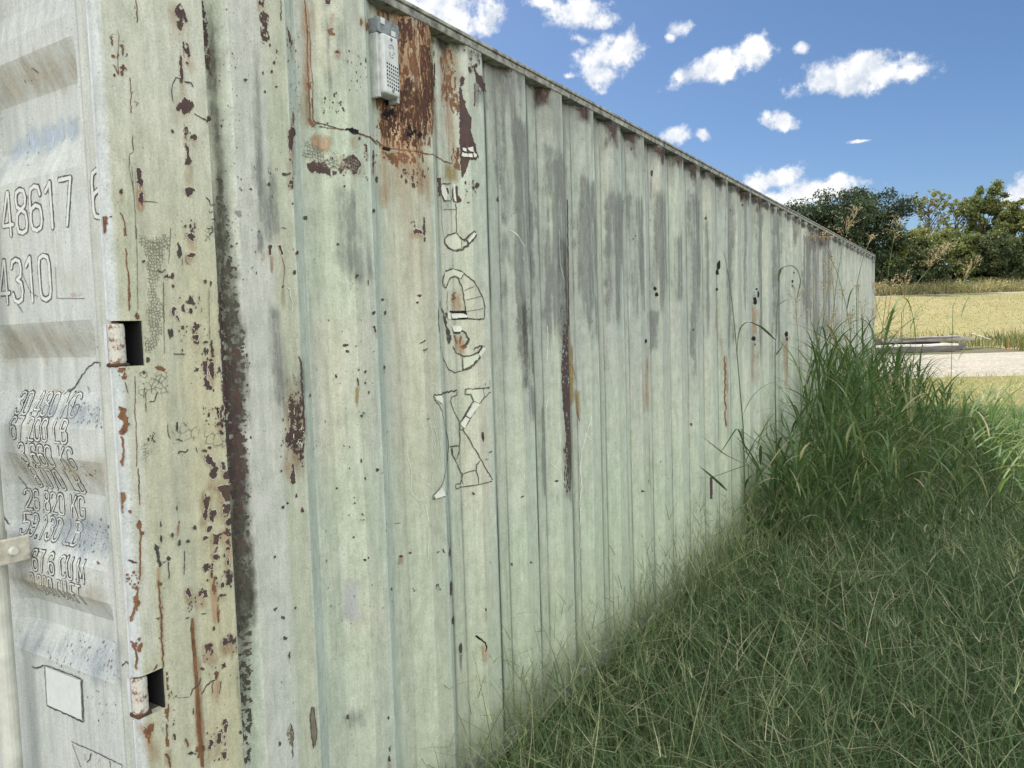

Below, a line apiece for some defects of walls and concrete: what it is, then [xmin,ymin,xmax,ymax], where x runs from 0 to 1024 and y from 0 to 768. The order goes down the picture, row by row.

corrosion [303,0,330,151]
corrosion [374,8,460,190]
crack [129,137,171,408]
crack [317,123,493,500]
peeling [444,269,468,332]
peeling [446,233,477,249]
peeling [461,389,484,428]
peeling [460,345,486,369]
corrosion [118,367,144,622]
corrosion [130,638,143,670]
corrosion [189,618,222,767]
corrosion [212,575,220,623]